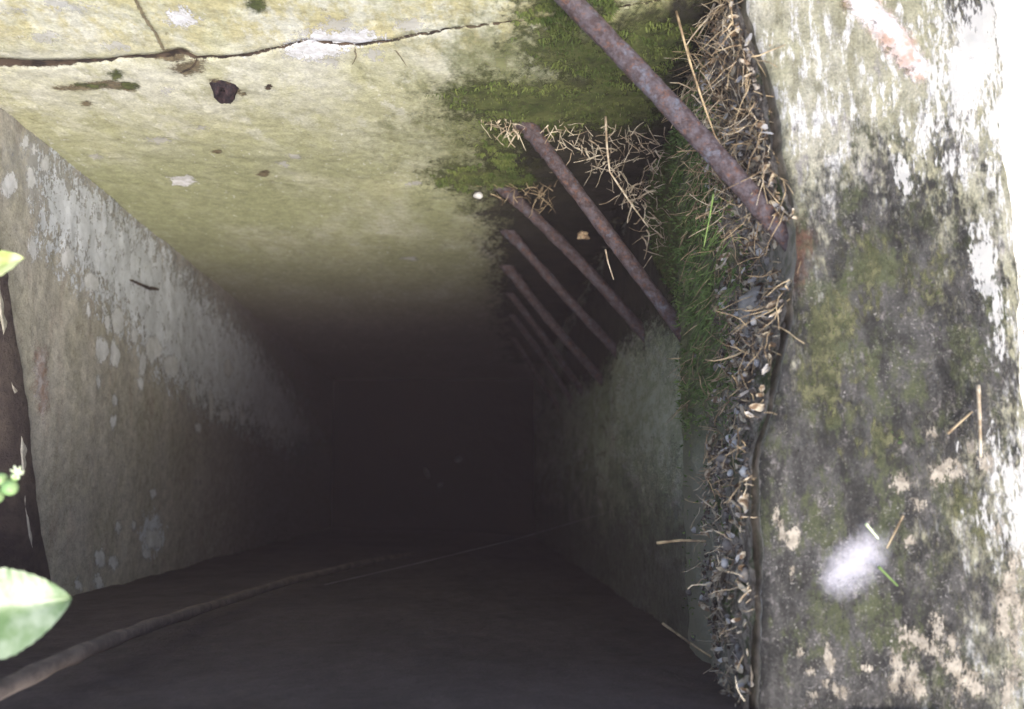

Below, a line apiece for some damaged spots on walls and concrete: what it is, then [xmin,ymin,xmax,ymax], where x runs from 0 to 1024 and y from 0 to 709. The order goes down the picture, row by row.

crack [618,0,661,8]
crack [0,0,560,77]
corrosion [499,230,528,252]
corrosion [499,265,533,299]
damp [968,210,1012,371]